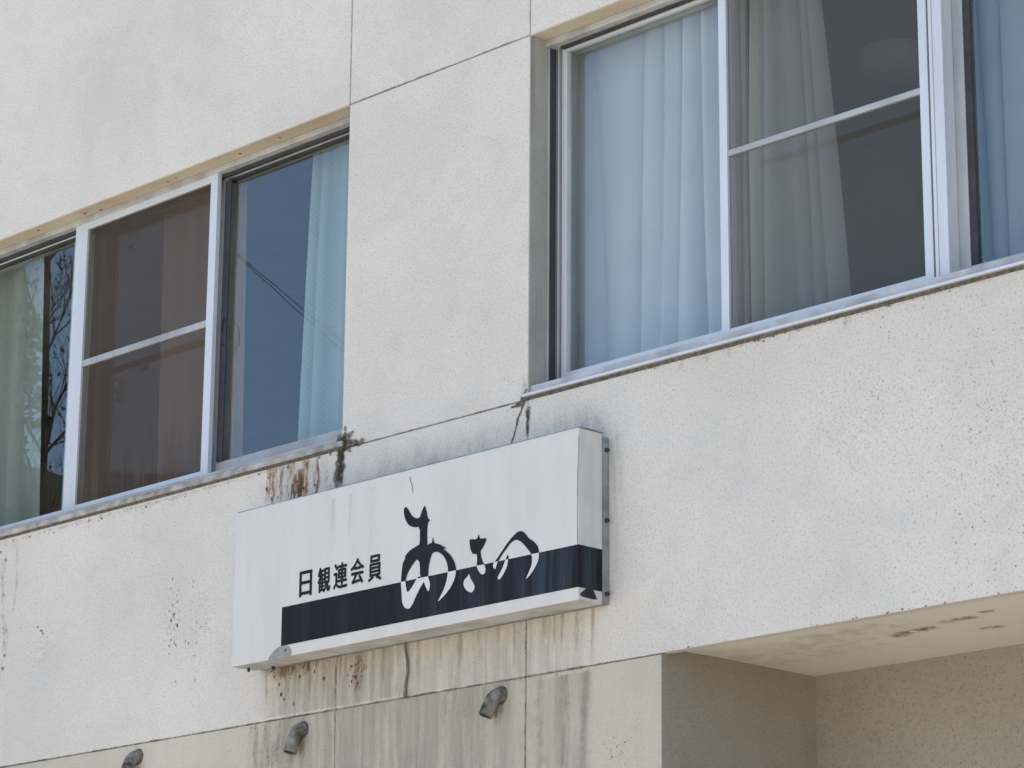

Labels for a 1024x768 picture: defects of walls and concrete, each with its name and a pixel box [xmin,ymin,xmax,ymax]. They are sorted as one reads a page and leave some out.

crack [511,389,527,443]
rust [266,463,320,501]
water stain [302,426,363,487]
rust [270,664,325,706]